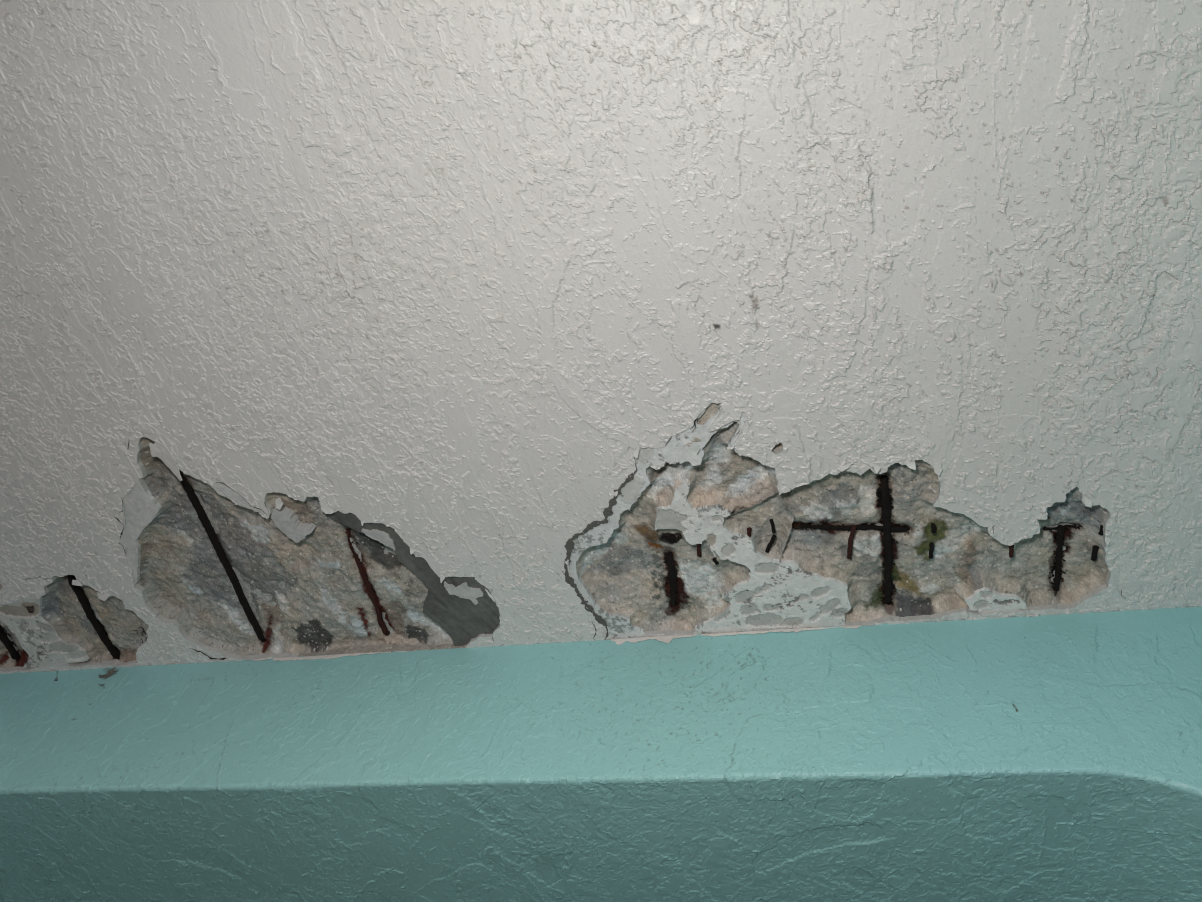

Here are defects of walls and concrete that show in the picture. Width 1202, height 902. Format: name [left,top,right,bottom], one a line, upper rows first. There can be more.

spalling [0,575,148,673]
spalling [138,437,500,663]
spalling [569,403,1111,645]